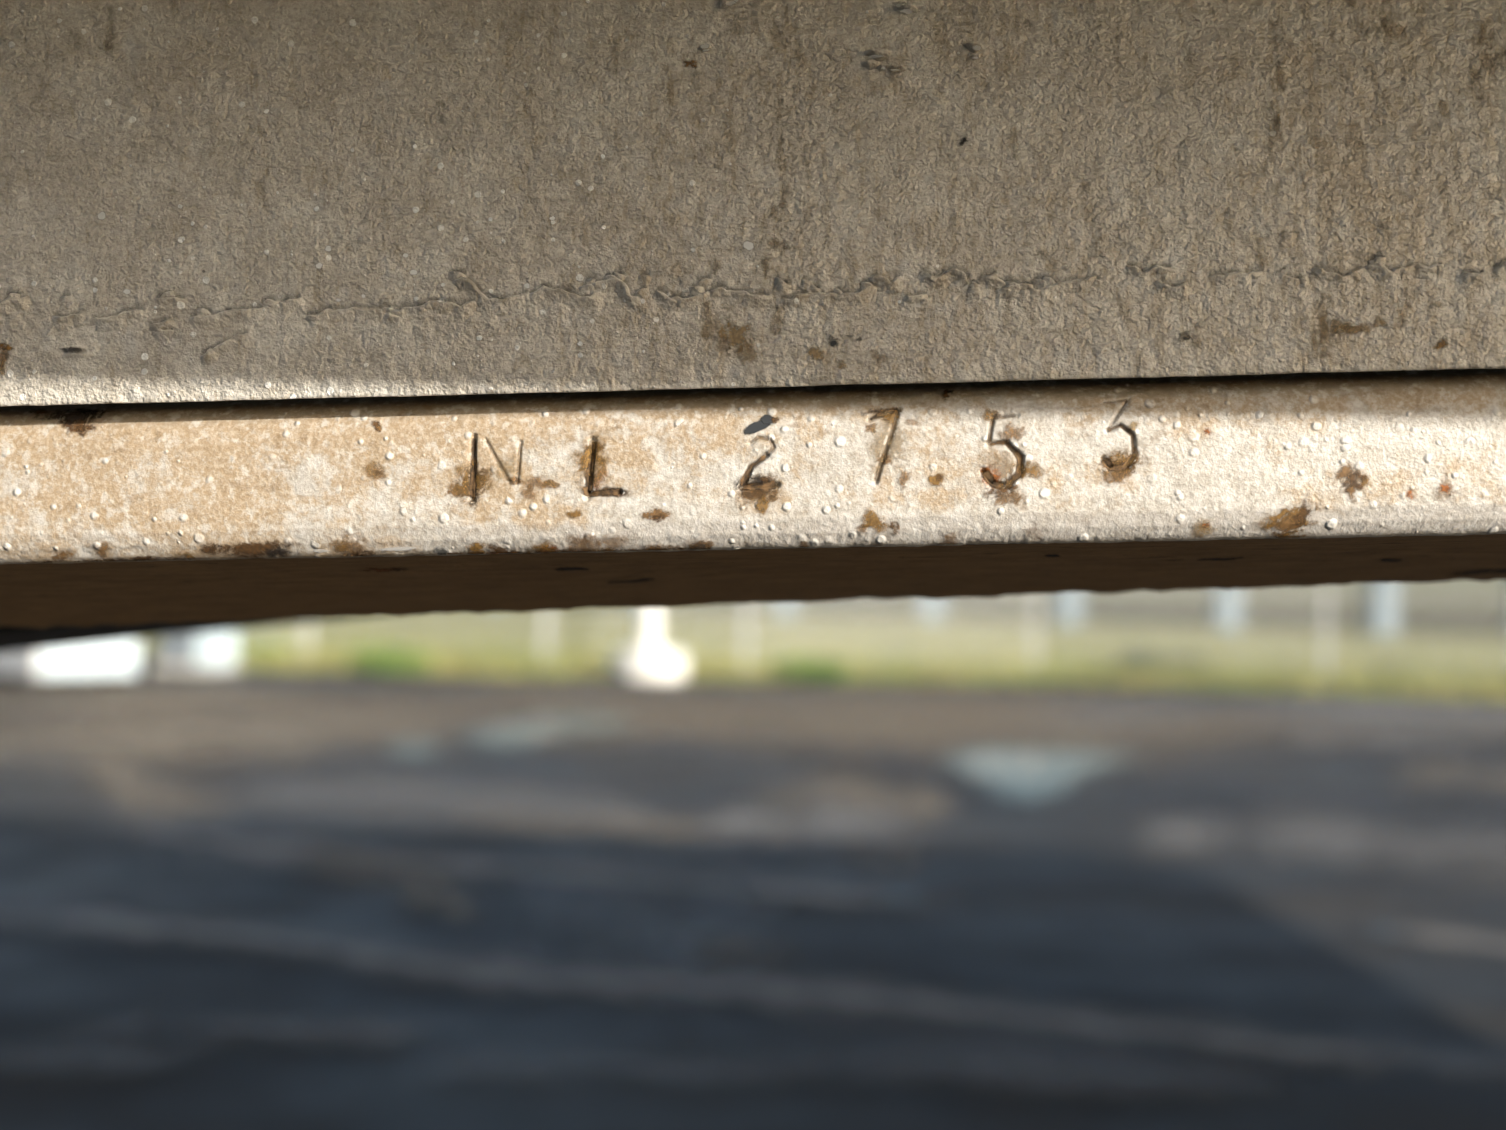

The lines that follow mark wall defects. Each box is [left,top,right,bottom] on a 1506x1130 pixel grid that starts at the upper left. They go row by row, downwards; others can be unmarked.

crack [0,226,1506,369]
corrosion [1337,463,1370,502]
corrosion [1261,500,1320,538]